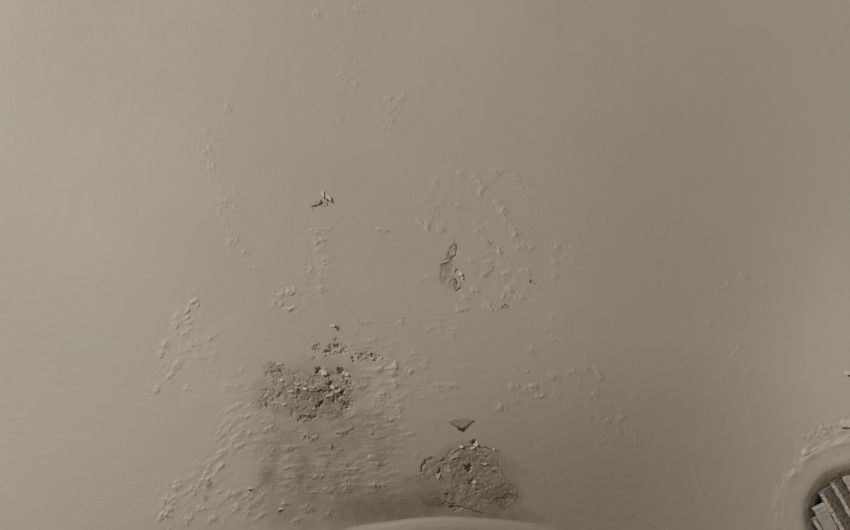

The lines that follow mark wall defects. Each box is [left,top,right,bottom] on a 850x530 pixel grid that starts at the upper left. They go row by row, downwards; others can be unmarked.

peeling [436,245,468,297]
flaking render [254,324,391,439]
flaking render [416,418,527,517]